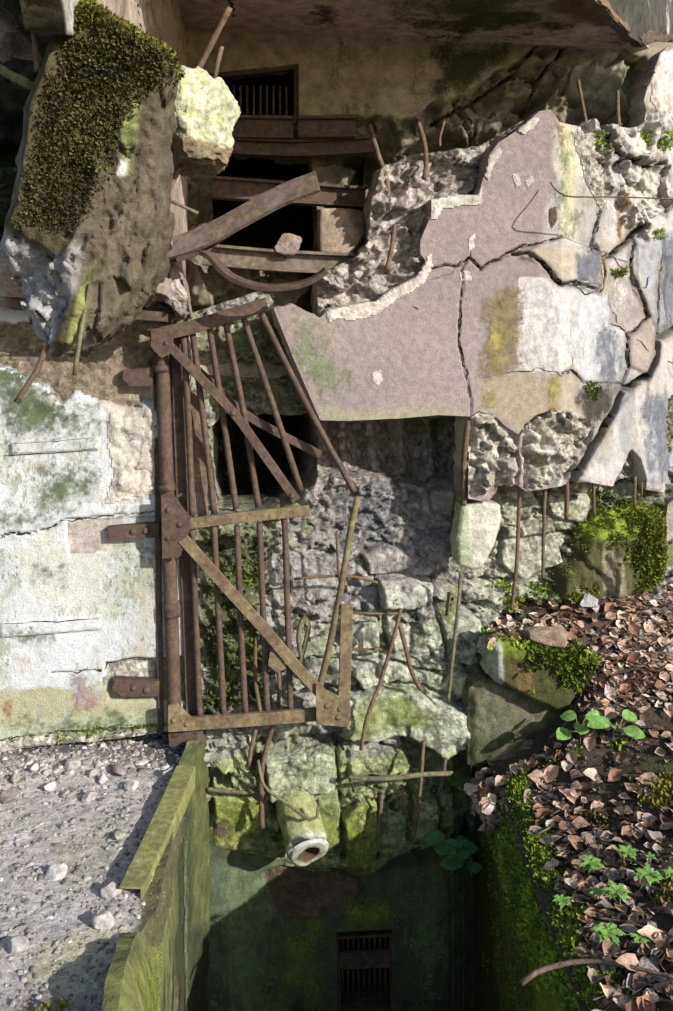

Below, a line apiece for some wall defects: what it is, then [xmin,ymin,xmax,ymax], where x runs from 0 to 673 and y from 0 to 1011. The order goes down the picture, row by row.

spalling [517,118,539,134]
spalling [427,147,502,219]
spalling [572,130,613,213]
spalling [327,254,434,322]
spalling [0,320,185,400]
crack [431,210,664,471]
flaking render [106,404,158,504]
spalling [468,412,590,493]
spalling [616,453,635,481]
crack [1,511,154,539]
leakage [56,711,146,736]
leakage [138,837,188,1011]